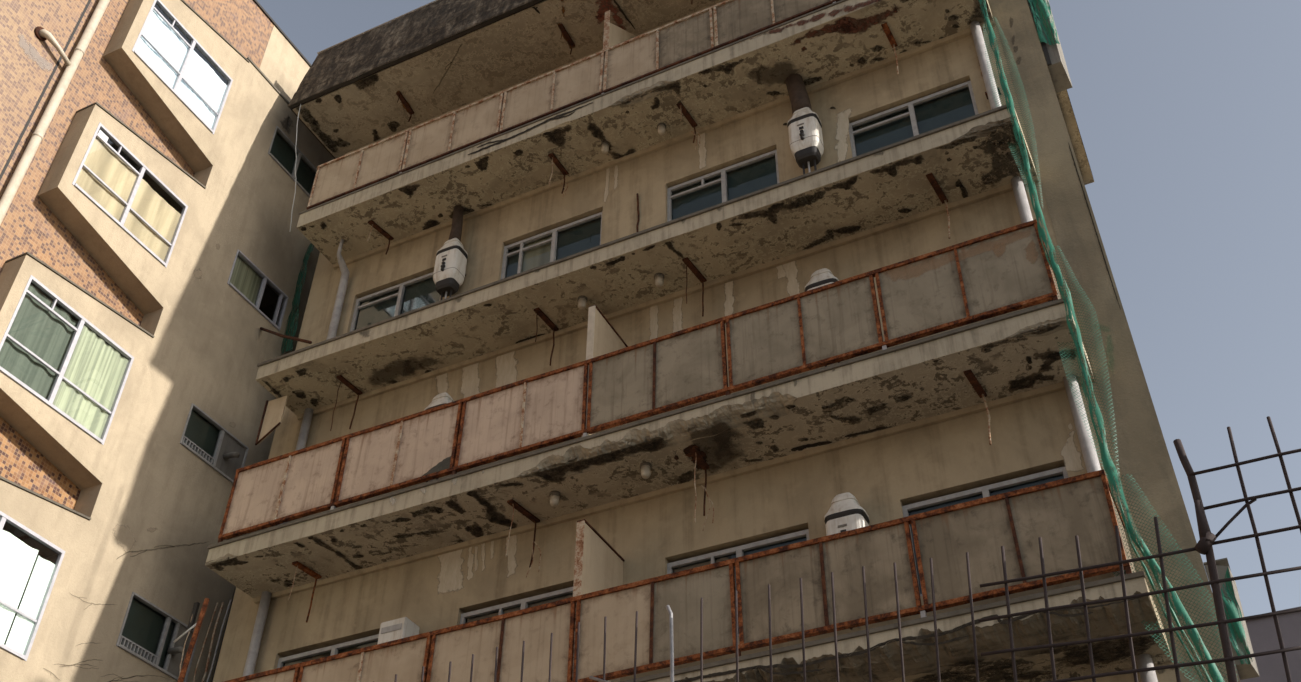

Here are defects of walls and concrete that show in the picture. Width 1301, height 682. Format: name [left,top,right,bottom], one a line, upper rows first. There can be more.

rust [751,0,901,51]
peeling [900,0,992,53]
peeling [850,45,884,67]
spalling [513,125,571,156]
spalling [588,123,634,159]
spalling [980,316,1077,393]
peeling [822,387,924,425]
spalling [498,392,797,487]
spalling [294,491,517,570]
spalling [707,591,1159,682]
crack [44,643,164,682]